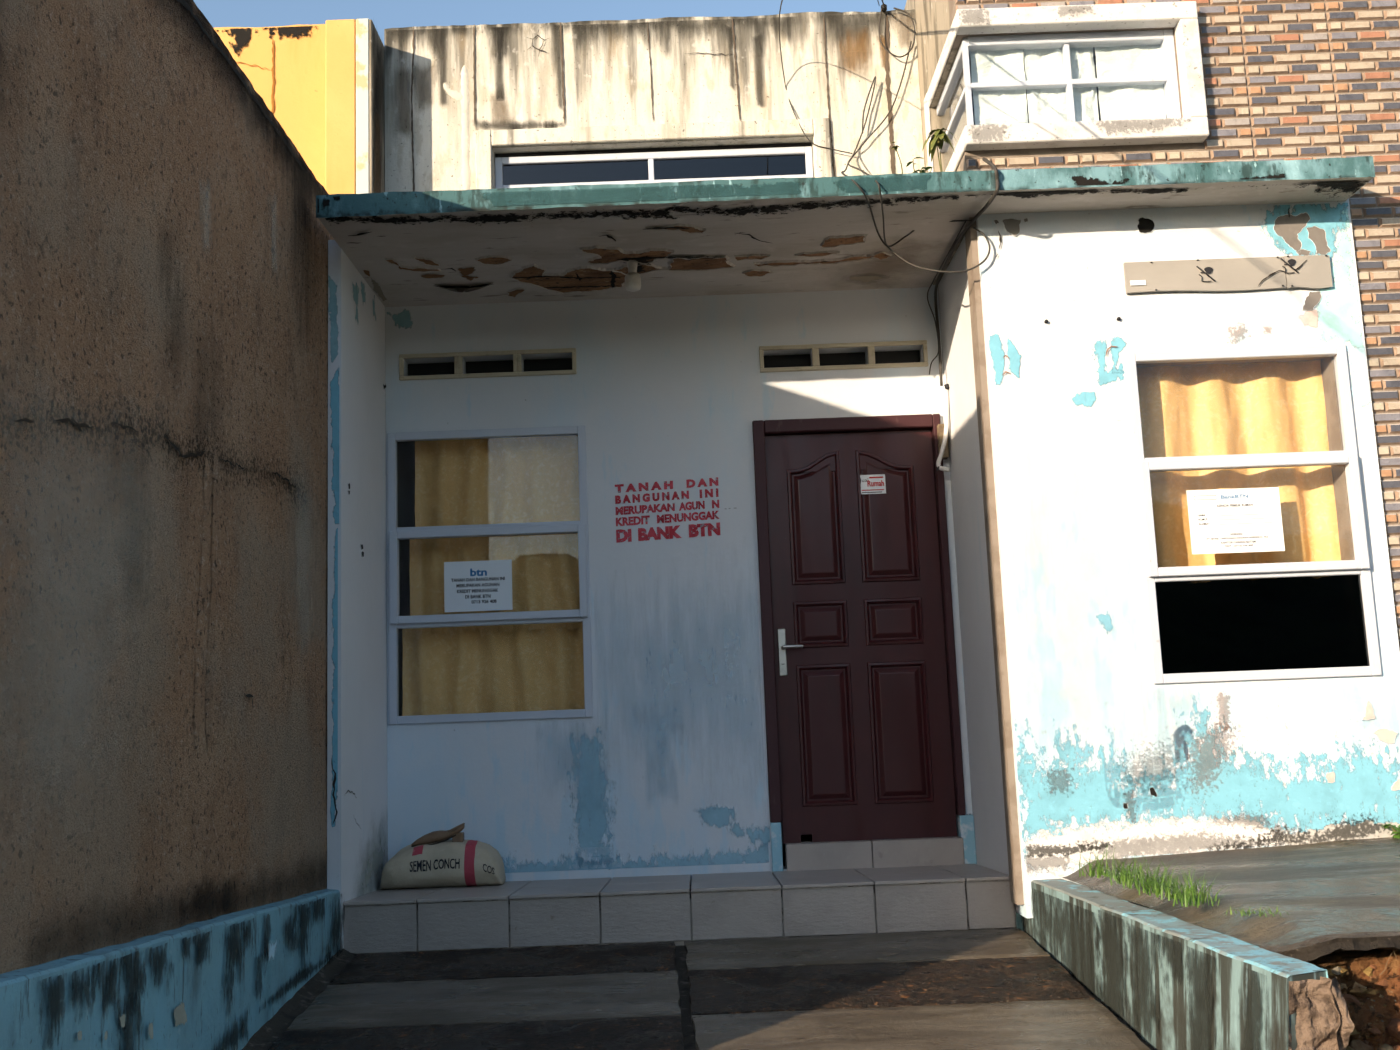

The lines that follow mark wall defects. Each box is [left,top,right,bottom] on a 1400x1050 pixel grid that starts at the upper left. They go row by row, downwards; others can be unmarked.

leakage [170,0,317,117]
leakage [373,28,464,193]
leakage [492,27,507,99]
leakage [476,122,557,130]
leakage [554,17,791,107]
leakage [274,130,1189,268]
flaking render [422,234,892,298]
peeling [989,334,1022,385]
peeling [1072,337,1127,407]
peeling [1261,203,1371,407]
crack [0,373,308,515]
peeling [1015,697,1400,876]